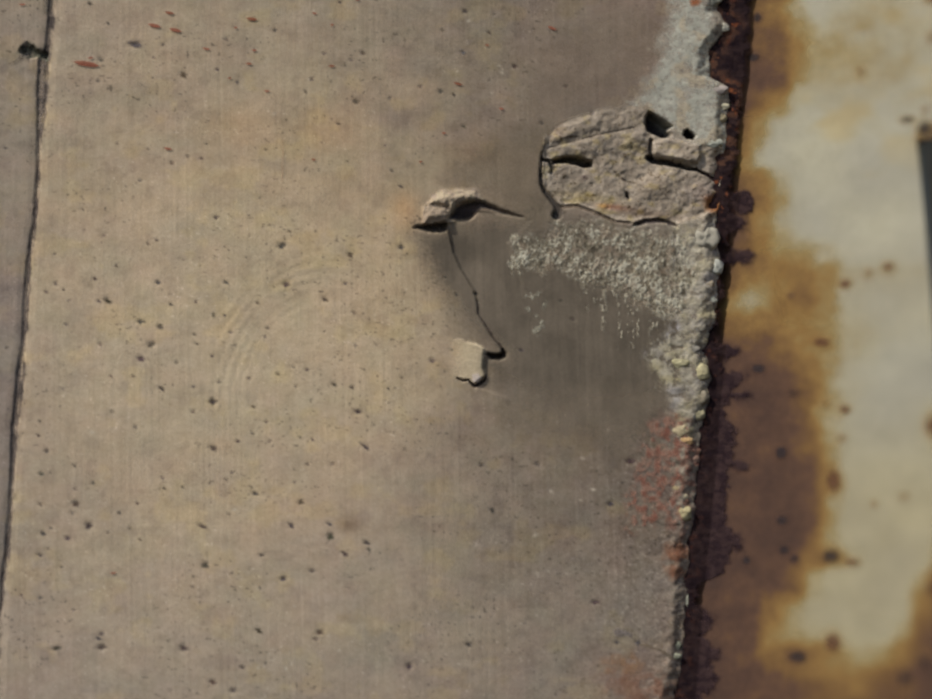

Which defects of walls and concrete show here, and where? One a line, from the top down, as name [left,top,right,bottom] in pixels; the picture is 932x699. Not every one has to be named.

peeling [457,343,506,387]
crack [478,306,505,353]
leakage [424,220,717,438]
spalling [512,0,730,528]
corrosion [628,417,698,525]
corrosion [693,0,932,699]